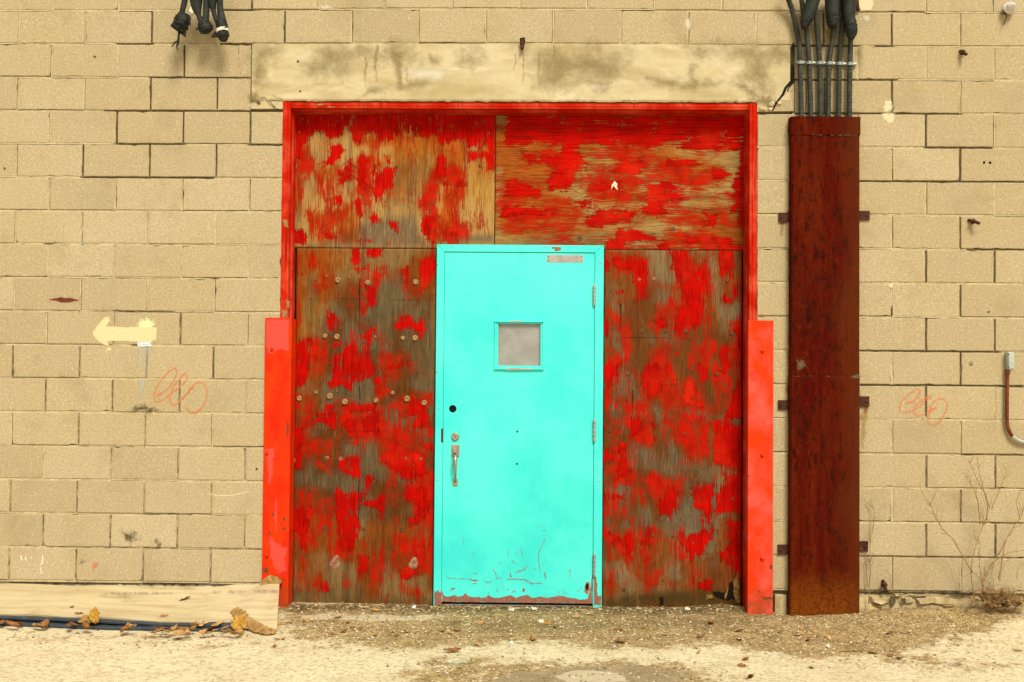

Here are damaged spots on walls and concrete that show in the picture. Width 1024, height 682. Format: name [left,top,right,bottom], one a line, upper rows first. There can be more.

peeling [282,219,308,247]
peeling [296,103,744,336]
peeling [393,312,428,342]
peeling [604,363,622,391]
peeling [401,396,429,430]
peeling [286,306,411,576]
peeling [603,415,658,501]
peeling [641,326,749,579]
peeling [268,503,311,551]
peeling [382,442,434,581]
peeling [609,525,652,559]
peeling [694,577,715,591]